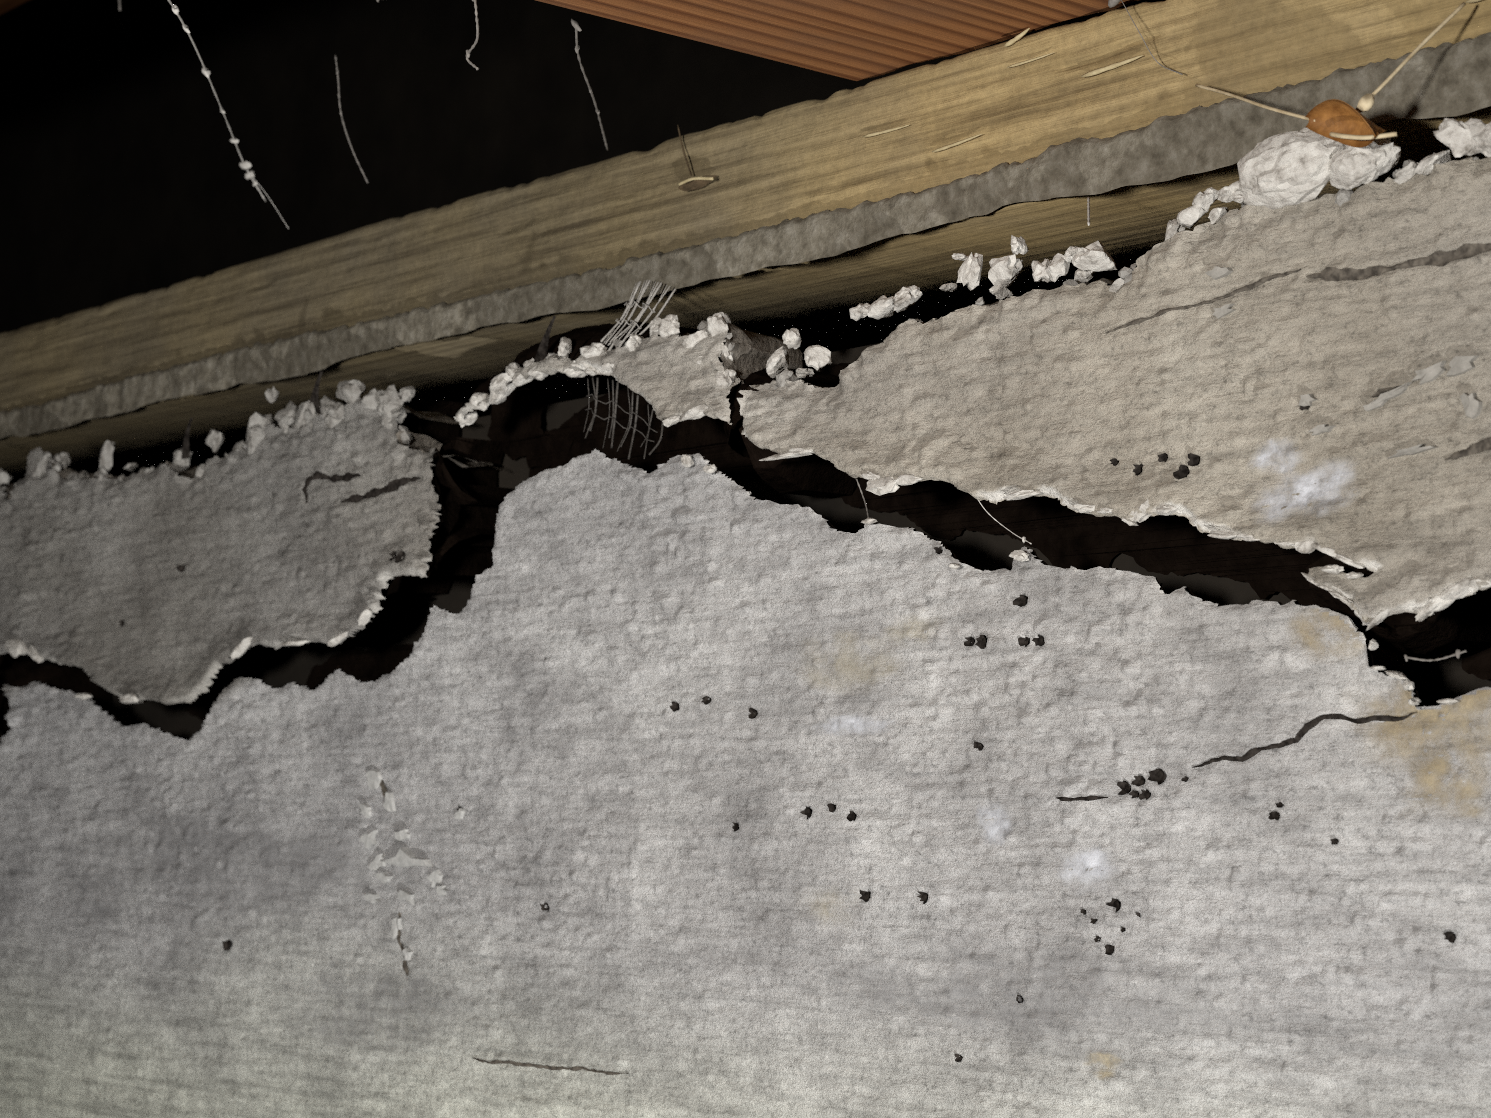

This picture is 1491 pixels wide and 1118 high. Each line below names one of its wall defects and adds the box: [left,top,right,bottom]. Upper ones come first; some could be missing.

flaking render [1165,118,1491,240]
flaking render [849,235,1137,324]
spalling [1106,243,1491,334]
flaking render [0,312,840,500]
spalling [1110,453,1200,479]
spalling [1444,437,1491,460]
spalling [388,551,405,563]
crack [0,322,1491,768]
crack [1057,794,1107,802]